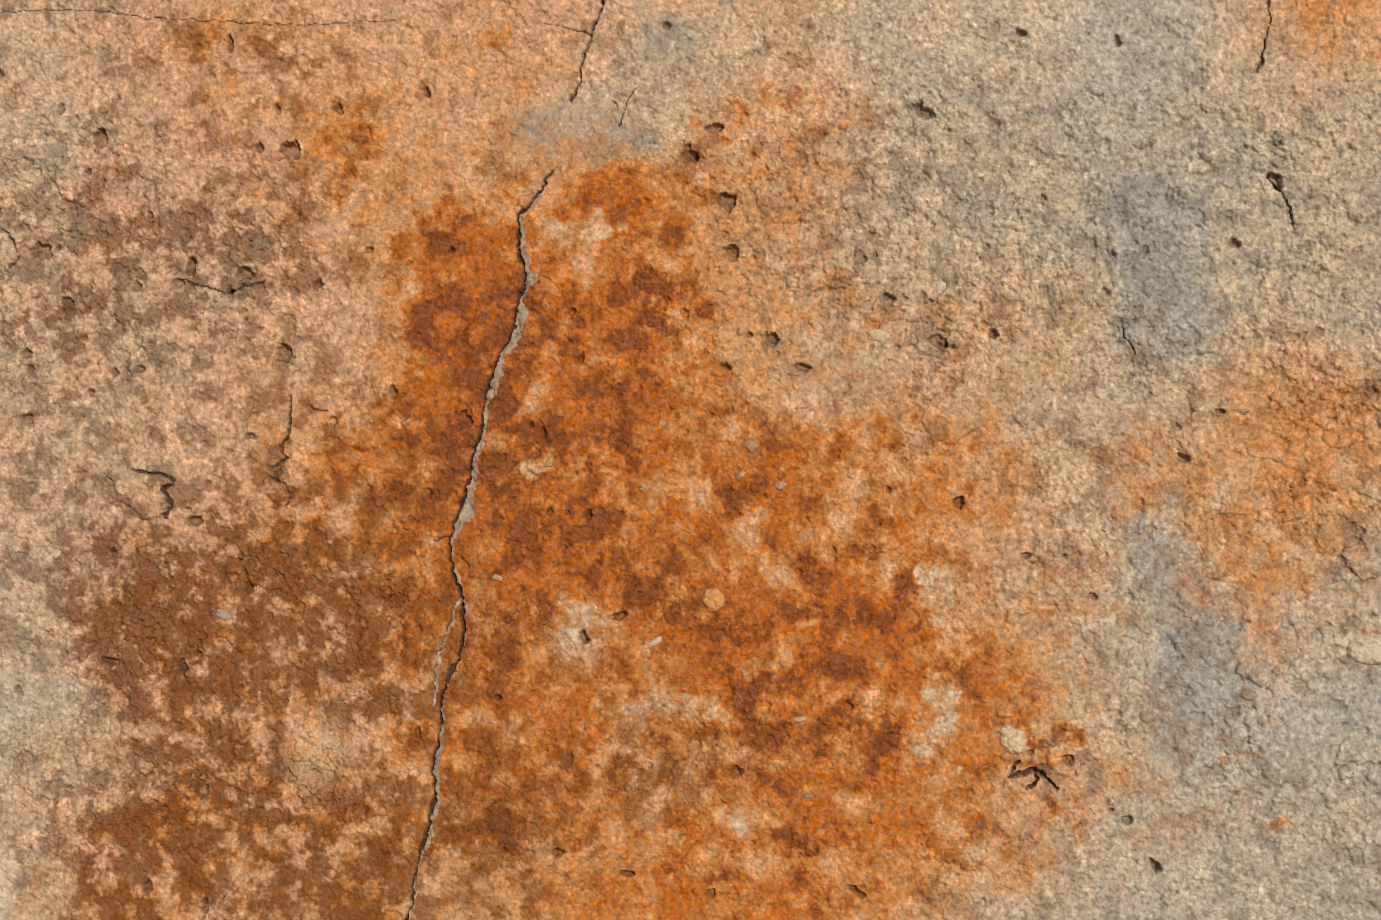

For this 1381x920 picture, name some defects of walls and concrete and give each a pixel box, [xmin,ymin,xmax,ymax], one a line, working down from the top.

corrosion [106,0,306,109]
corrosion [420,0,540,147]
crack [545,0,605,104]
corrosion [750,0,819,59]
crack [406,167,560,920]
corrosion [12,52,1134,920]
corrosion [951,292,1381,697]
corrosion [1200,697,1312,851]